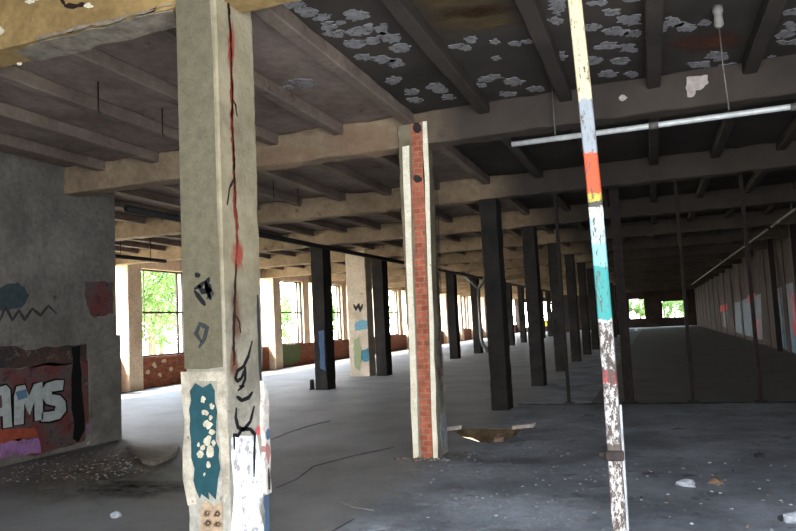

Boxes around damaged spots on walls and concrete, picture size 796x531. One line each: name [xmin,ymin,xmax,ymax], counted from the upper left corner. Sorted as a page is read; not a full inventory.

spalling [17,2,176,65]
peeling [282,1,456,103]
peeling [448,35,478,51]
peeling [489,38,533,47]
peeling [547,0,566,25]
peeling [585,0,643,78]
peeling [663,16,712,32]
peeling [774,8,796,45]
peeling [476,74,545,98]
spalling [686,51,736,97]
crack [227,3,241,365]